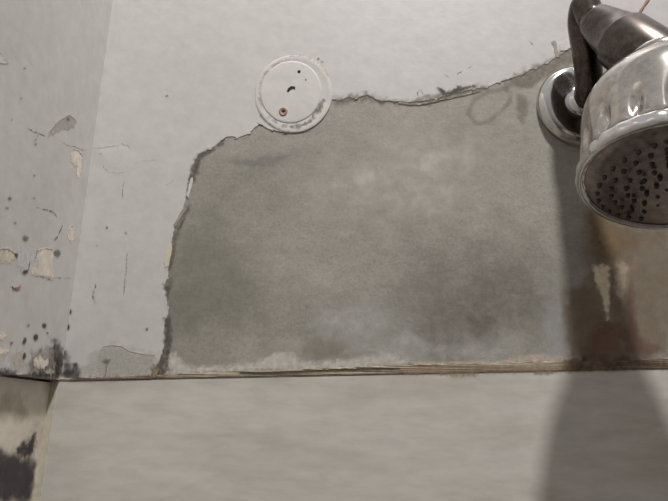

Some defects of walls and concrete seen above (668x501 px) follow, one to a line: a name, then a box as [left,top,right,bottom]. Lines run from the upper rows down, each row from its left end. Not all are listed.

flaking render [35,115,76,141]
peeling [149,39,668,380]
peeling [0,248,61,280]
damp [568,215,668,354]
mould [23,339,79,379]
damp [0,433,36,501]